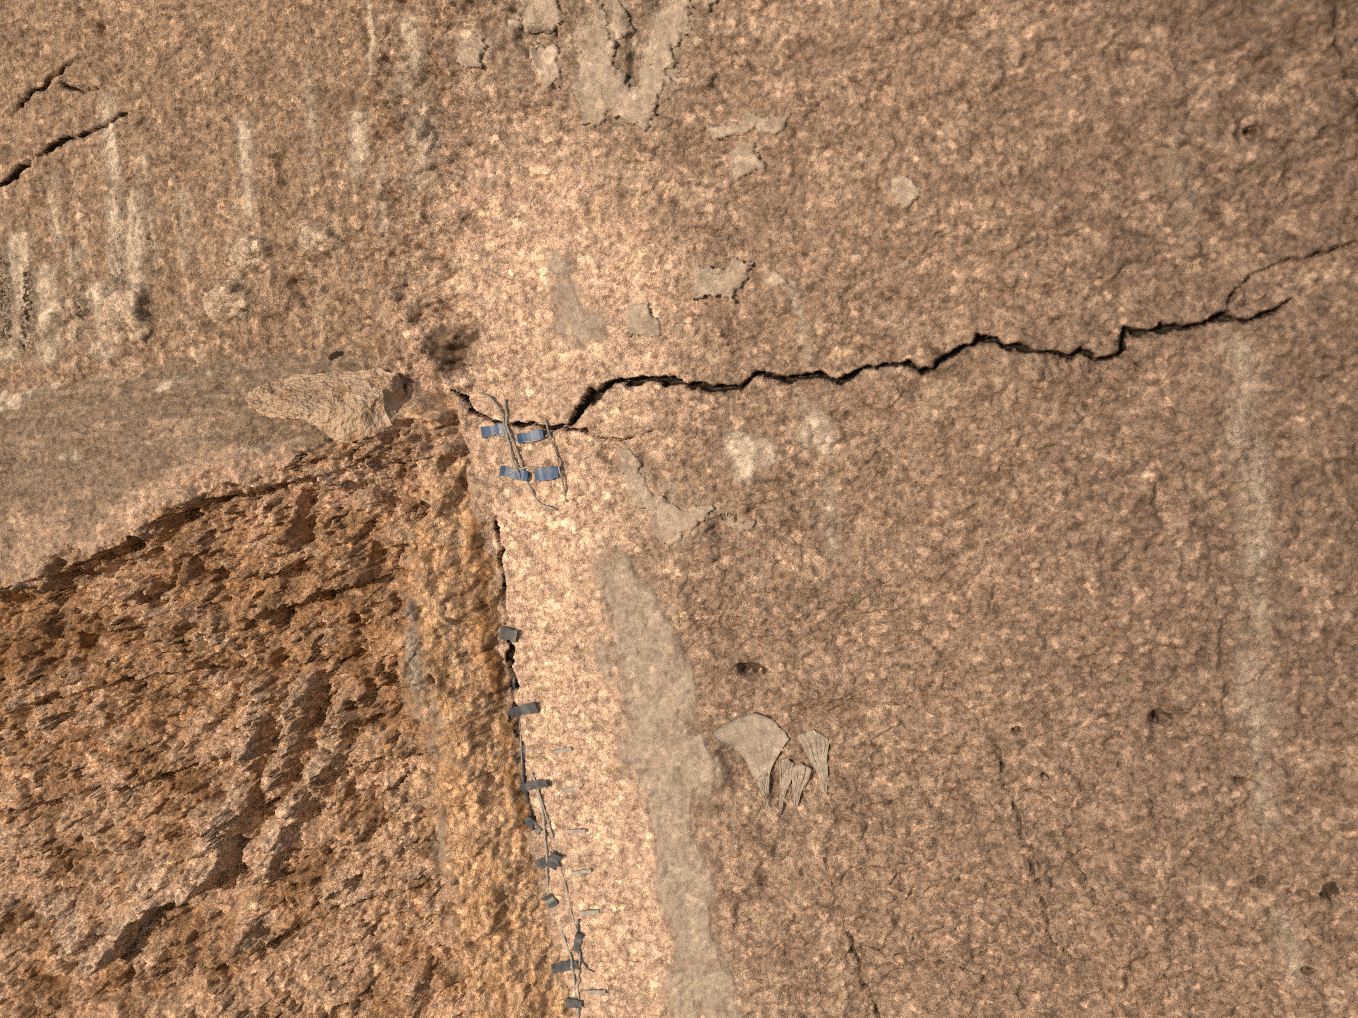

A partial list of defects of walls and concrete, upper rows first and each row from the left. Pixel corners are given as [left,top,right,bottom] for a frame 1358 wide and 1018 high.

crack [18,68,83,109]
crack [0,130,91,187]
crack [451,277,1292,441]